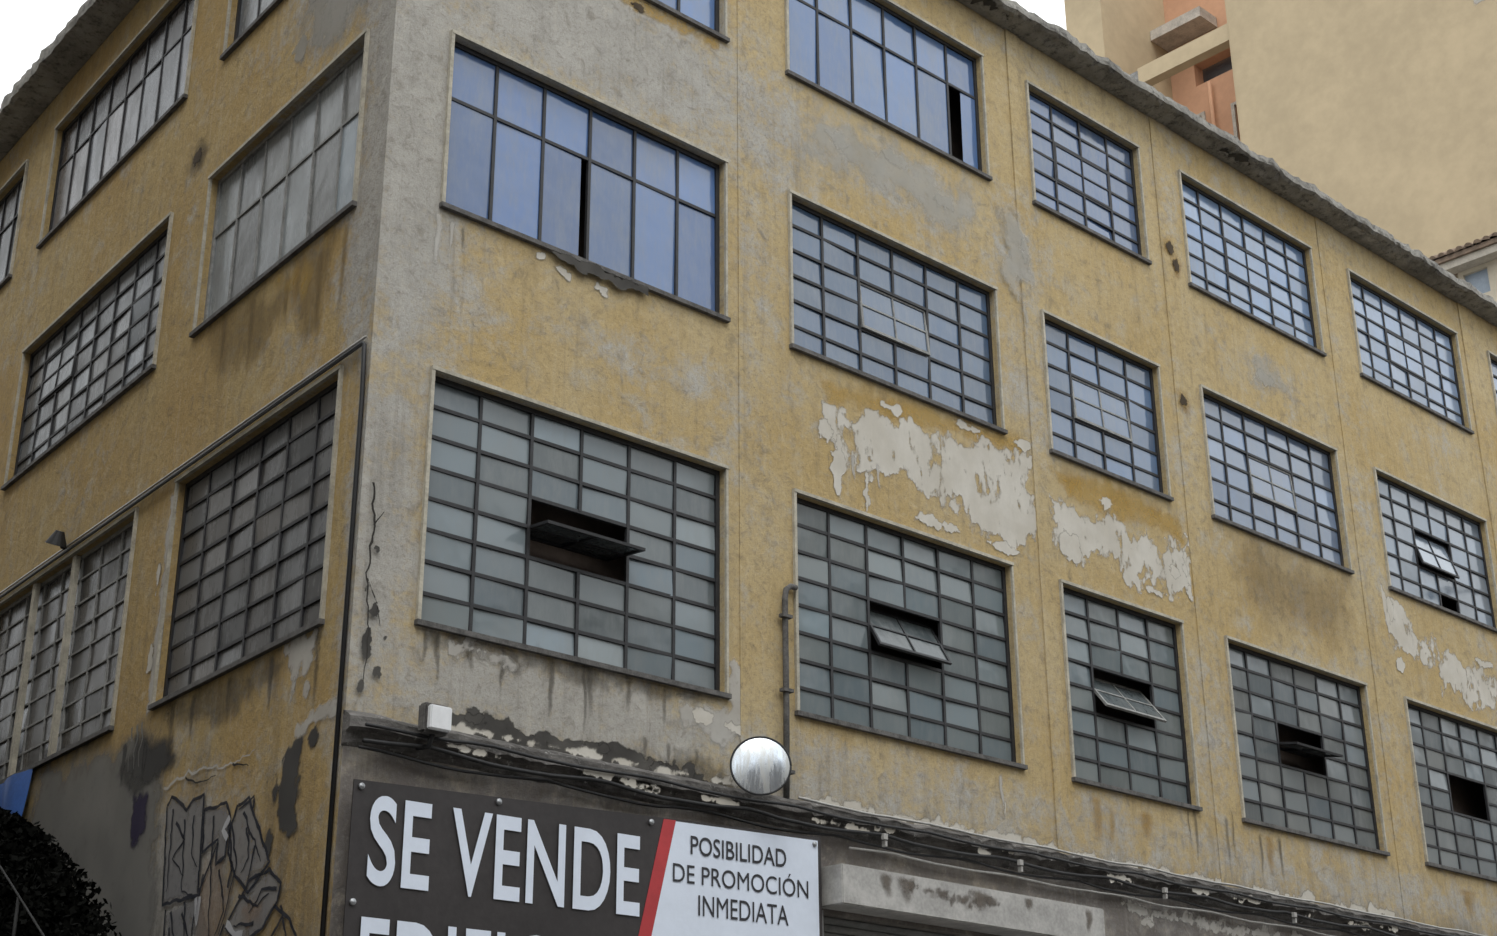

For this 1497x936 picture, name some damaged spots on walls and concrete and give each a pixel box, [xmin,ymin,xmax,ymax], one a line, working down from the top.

peeling [818,400,1193,602]
crack [363,482,384,682]
water stain [448,637,516,671]
peeling [1380,583,1497,711]
spalling [451,706,708,782]